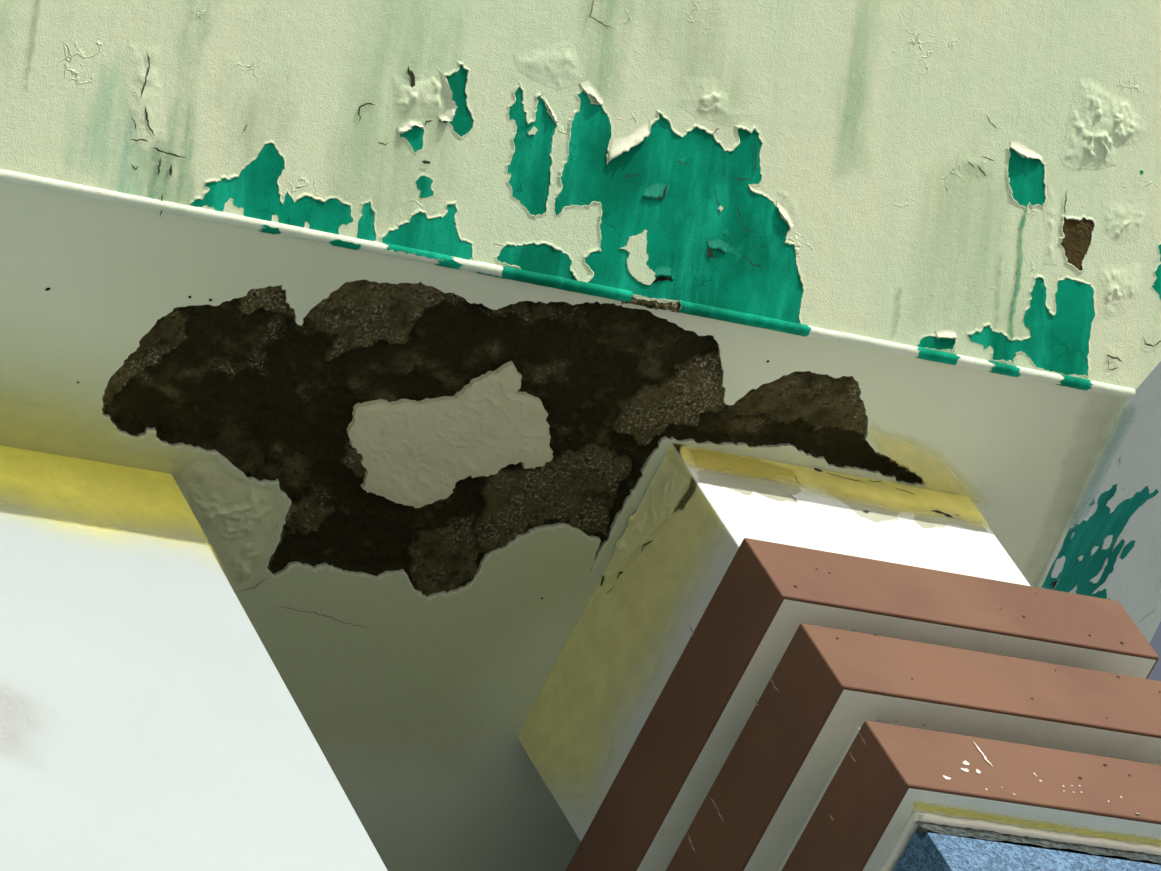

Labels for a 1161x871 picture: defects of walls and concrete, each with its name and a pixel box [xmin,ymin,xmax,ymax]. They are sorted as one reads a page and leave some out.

peeling [436,61,476,140]
peeling [1004,141,1048,212]
flaking render [102,80,926,598]
peeling [915,214,1097,390]
peeling [1150,241,1161,309]
peeling [825,490,989,534]
peeling [1036,481,1160,600]
damp [517,438,987,783]